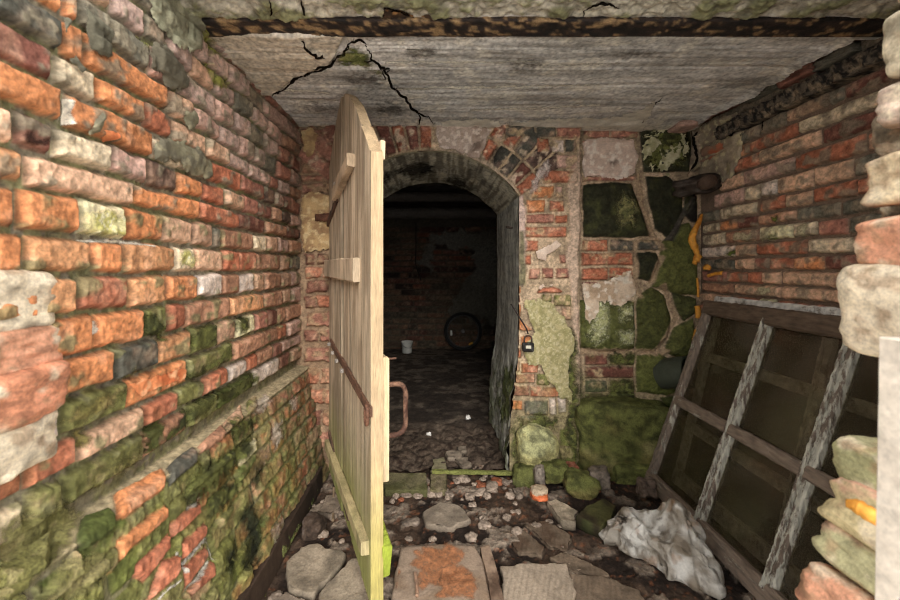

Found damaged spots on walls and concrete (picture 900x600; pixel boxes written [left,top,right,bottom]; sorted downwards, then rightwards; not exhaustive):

crack [267,39,435,125]
peeling [536,240,561,261]
peeling [581,271,637,324]
peeling [524,284,575,402]
leakage [270,424,283,449]
leakage [226,502,261,572]
leakage [159,538,211,600]